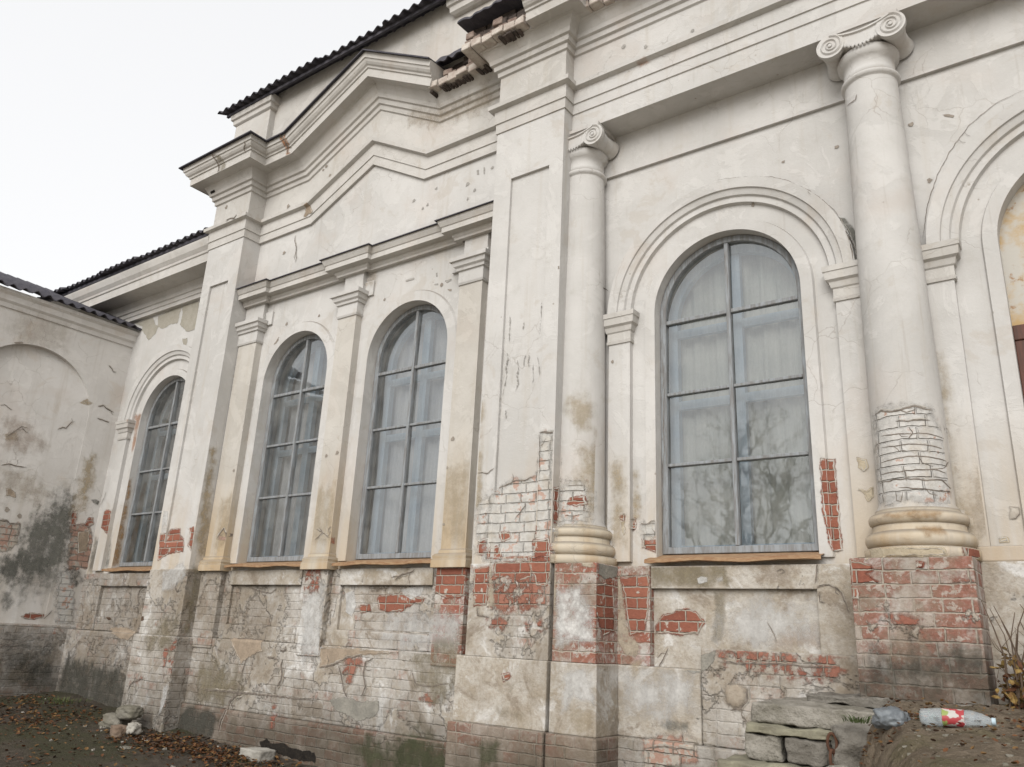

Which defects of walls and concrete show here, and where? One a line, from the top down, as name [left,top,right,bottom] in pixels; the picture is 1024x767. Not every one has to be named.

flaking render [856,404,951,506]
flaking render [0,488,22,552]
damp [1,457,131,603]
flaking render [21,493,113,624]
flaking render [158,511,194,592]
flaking render [345,430,591,632]
flaking render [597,575,705,636]
flaking render [718,650,847,682]
flaking render [820,458,878,601]
flaking render [886,614,933,638]